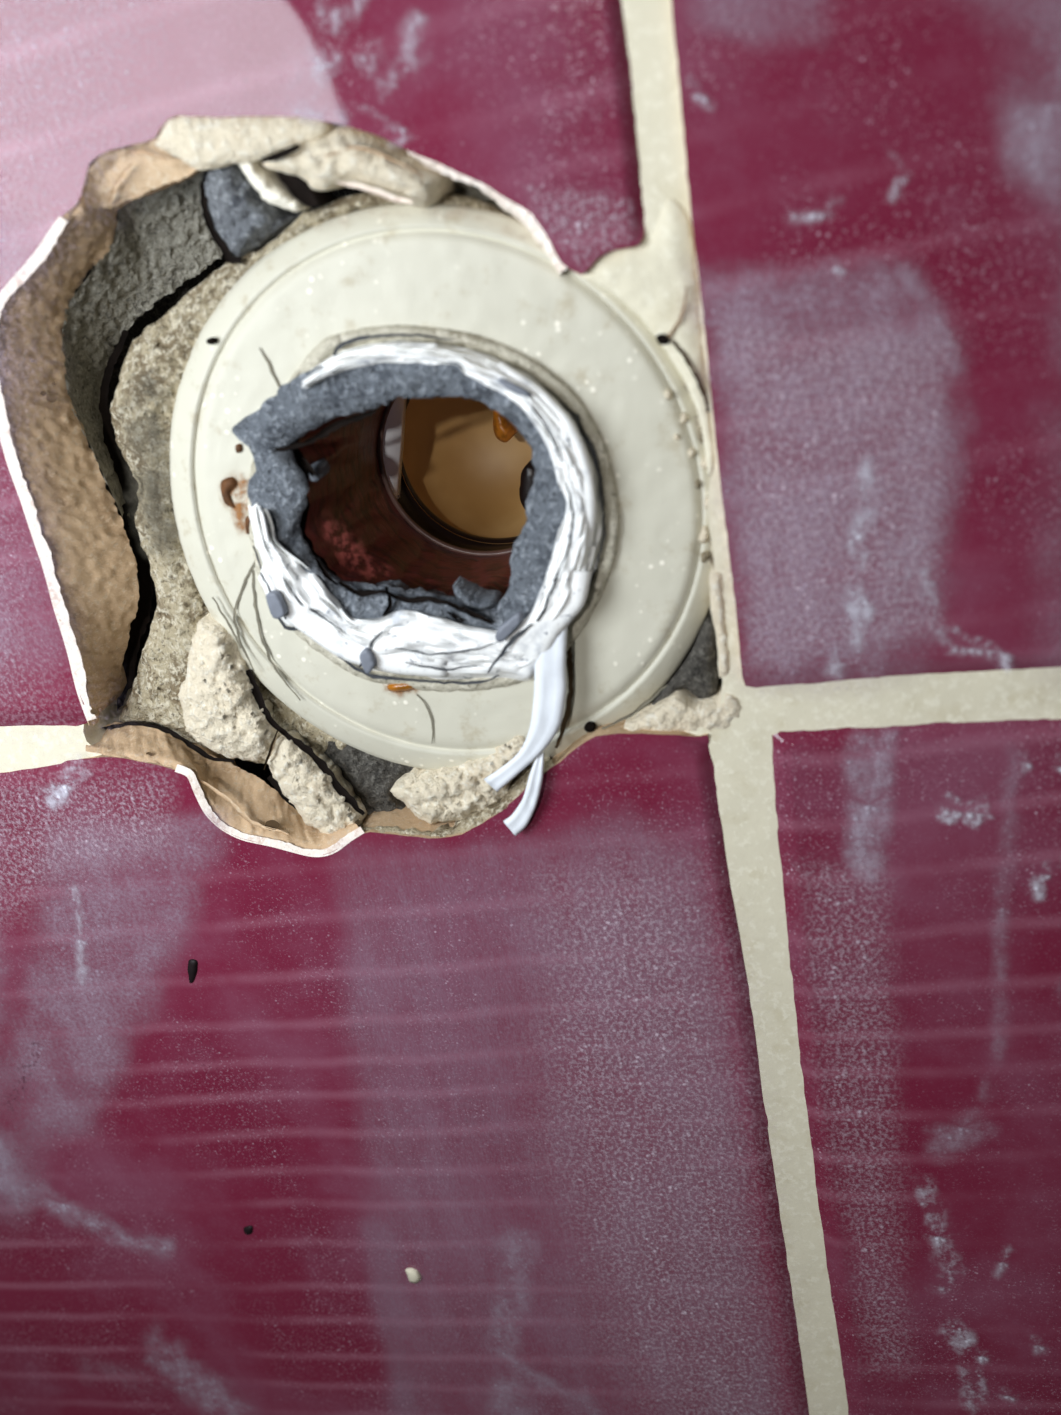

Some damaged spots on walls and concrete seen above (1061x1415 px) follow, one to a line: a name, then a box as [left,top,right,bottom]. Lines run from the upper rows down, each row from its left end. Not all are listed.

spalling [0,140,567,857]
peeling [680,412,710,563]